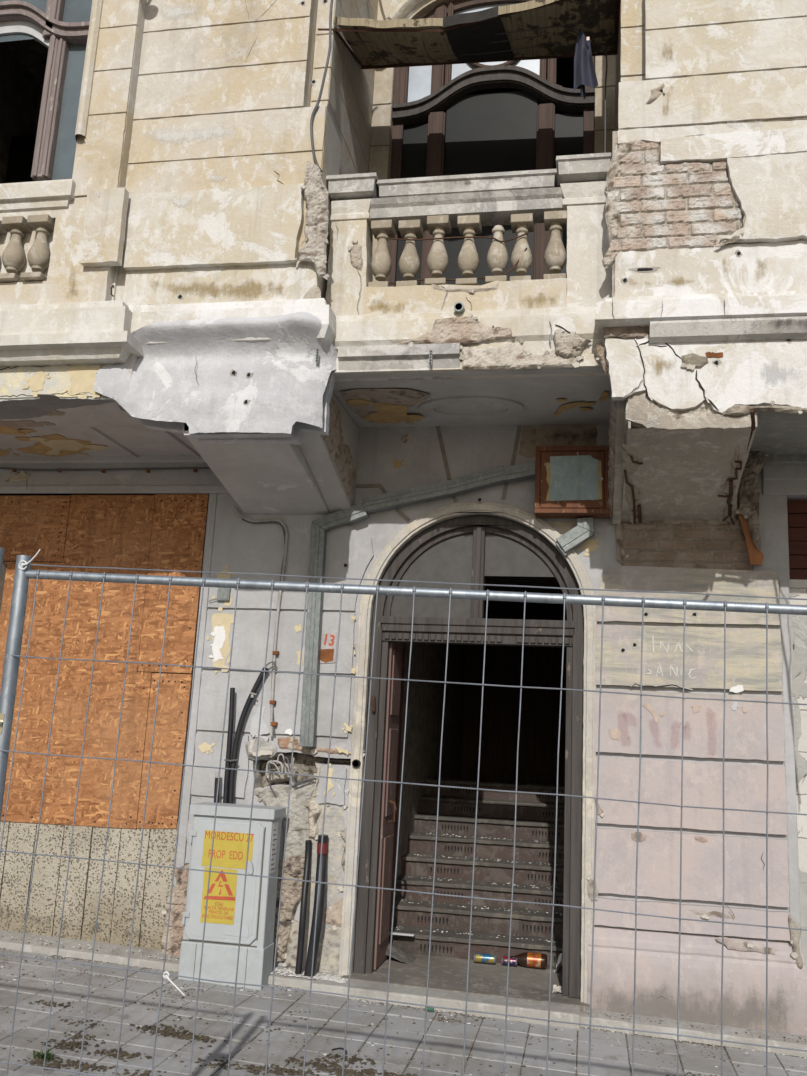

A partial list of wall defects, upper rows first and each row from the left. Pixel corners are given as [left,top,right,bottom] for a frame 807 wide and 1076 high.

flaking render [294,161,330,299]
flaking render [602,140,746,269]
peeling [0,365,126,457]
flaking render [321,389,430,500]
flaking render [392,313,649,375]
crack [624,339,719,410]
flaking render [551,392,807,571]
flaking render [681,352,723,371]
flaking render [245,702,365,973]